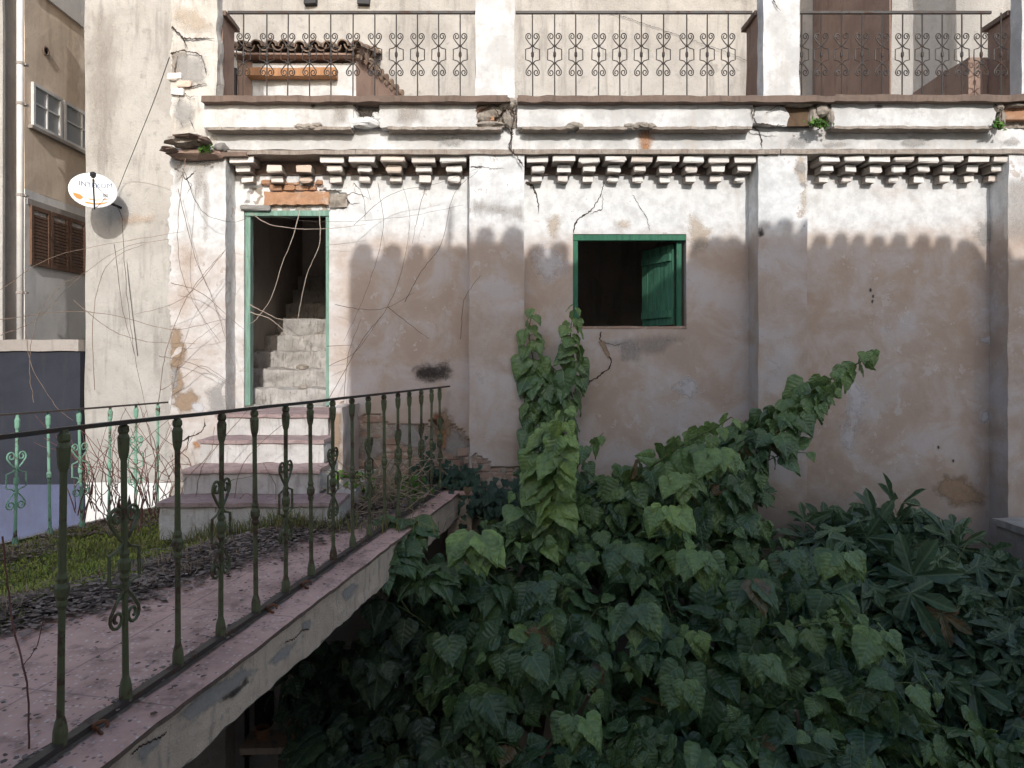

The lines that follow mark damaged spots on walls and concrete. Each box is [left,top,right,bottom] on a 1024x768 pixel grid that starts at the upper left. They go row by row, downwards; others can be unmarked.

spalling [167,52,203,122]
crack [471,104,539,212]
crack [751,105,785,145]
crack [573,184,604,233]
peeling [170,328,226,411]
crack [581,332,625,399]
spalling [358,415,519,497]